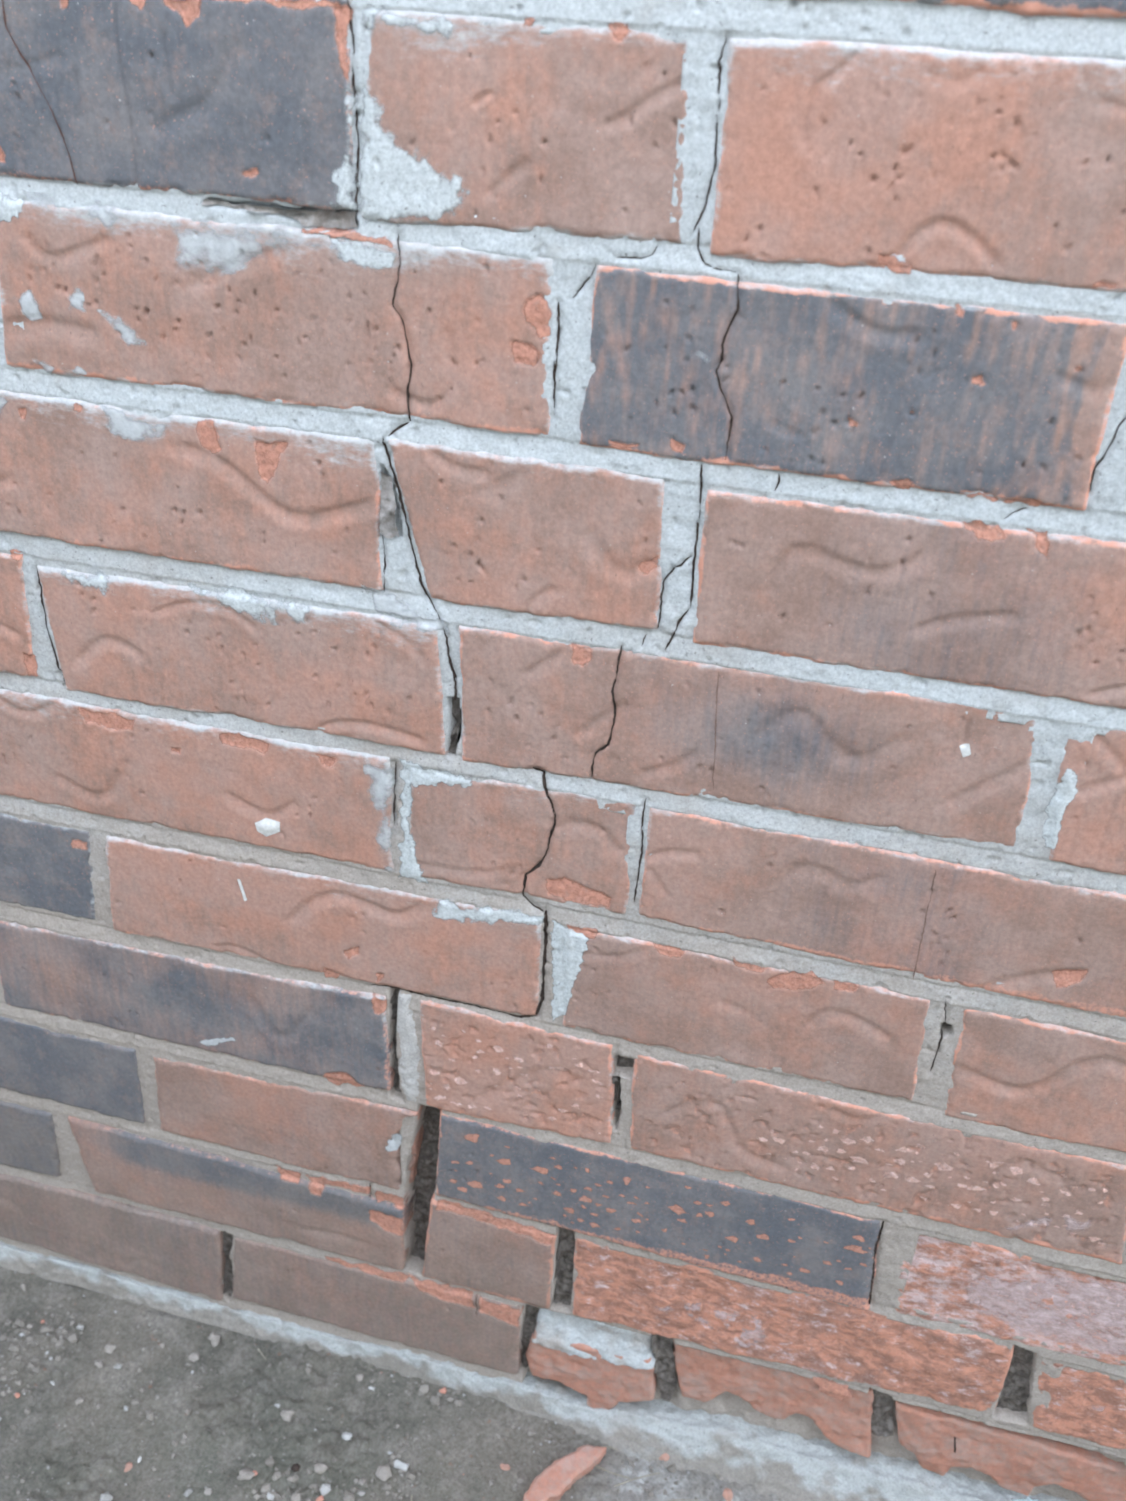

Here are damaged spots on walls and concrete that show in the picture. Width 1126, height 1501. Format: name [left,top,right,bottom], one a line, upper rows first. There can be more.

crack [2,0,78,185]
crack [382,234,457,700]
crack [553,245,658,408]
crack [591,35,739,789]
crack [372,764,556,1018]
peeling [372,973,403,1095]
spalling [275,1026,1126,1501]